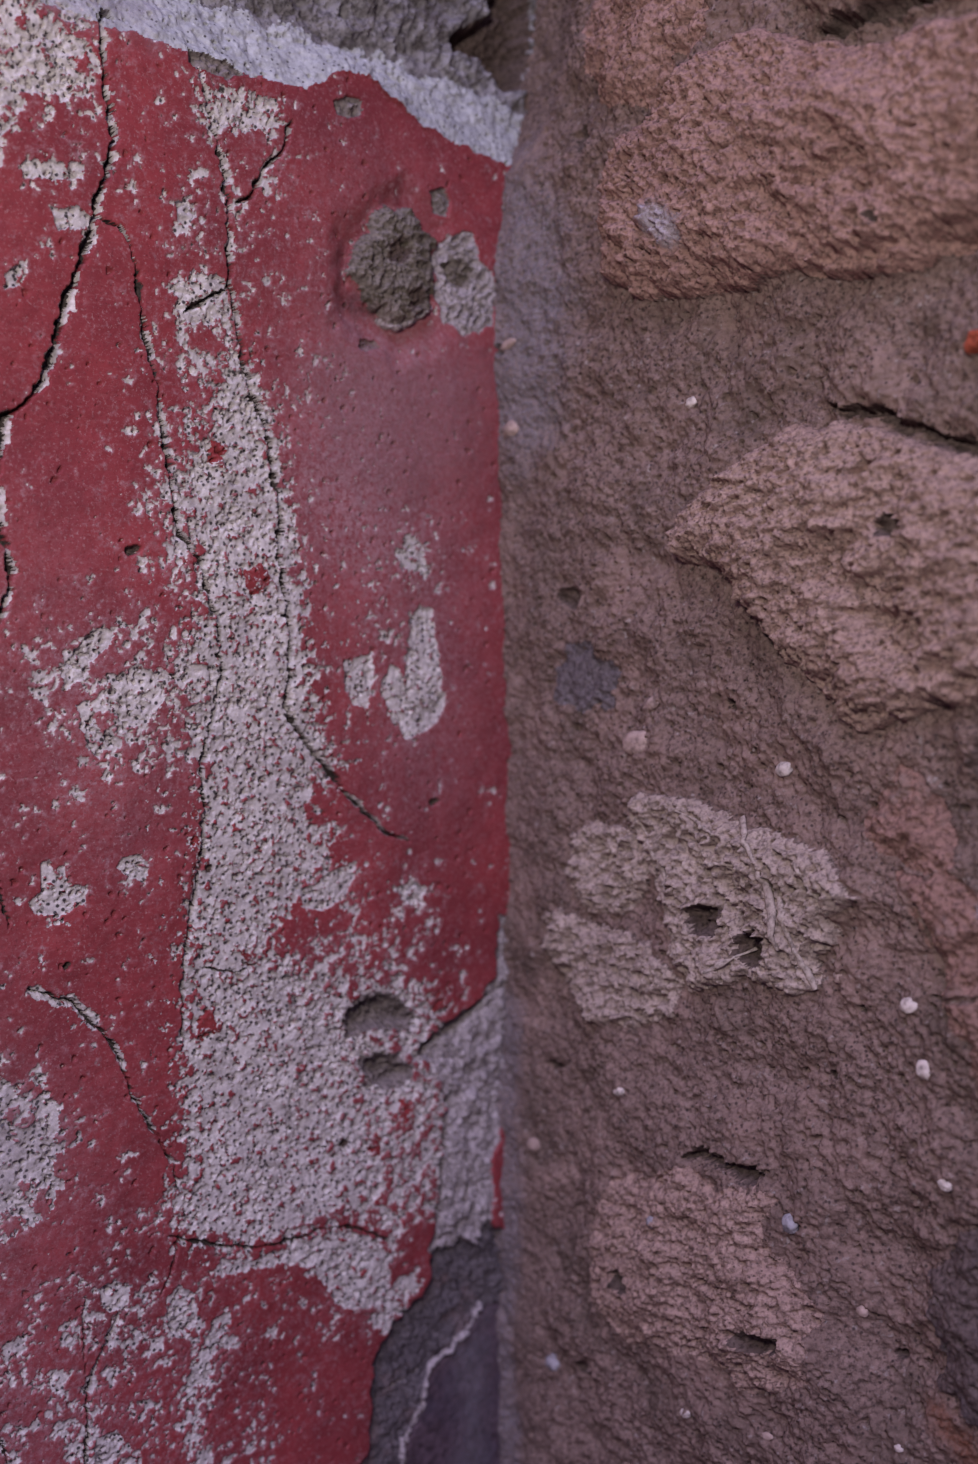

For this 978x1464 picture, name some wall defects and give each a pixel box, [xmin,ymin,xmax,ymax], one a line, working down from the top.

peeling [20,150,103,181]
peeling [51,205,91,230]
spalling [0,0,537,166]
spalling [343,186,496,352]
crack [0,7,255,1046]
crack [183,67,409,840]
peeling [12,860,84,926]
peeling [60,269,509,1464]
peeling [0,1052,82,1243]
crack [27,986,178,1192]
crack [169,1223,390,1267]
crack [81,1297,121,1464]